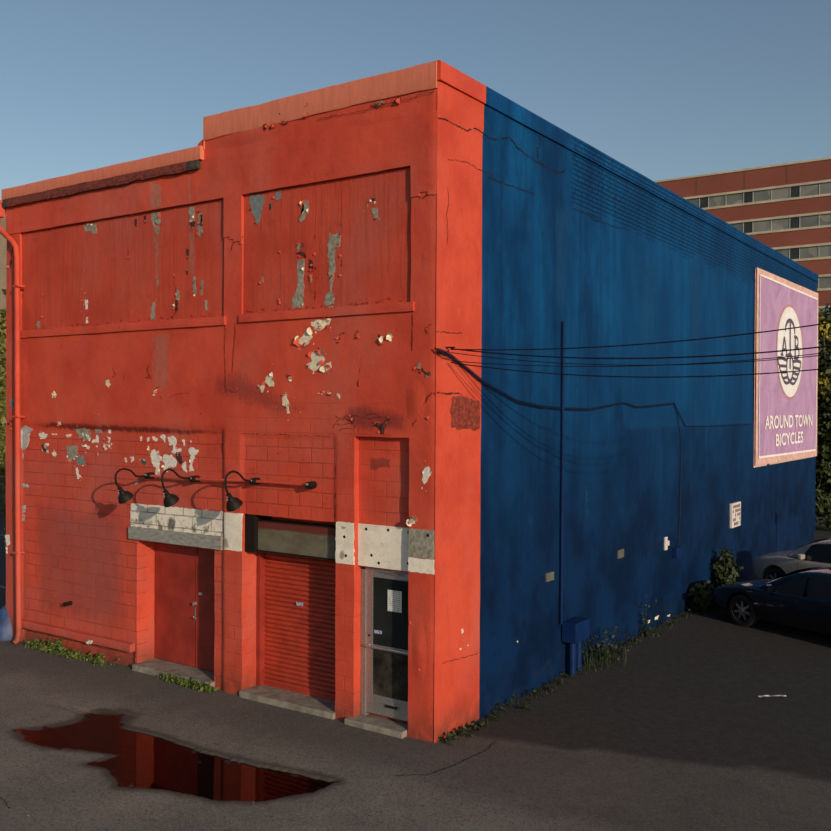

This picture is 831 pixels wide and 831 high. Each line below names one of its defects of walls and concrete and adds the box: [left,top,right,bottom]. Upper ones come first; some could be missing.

crack [437,117,621,203]
peeling [133,212,161,234]
peeling [189,207,204,238]
peeling [249,189,281,225]
peeling [298,200,309,222]
peeling [186,248,209,311]
peeling [120,286,180,323]
peeling [276,224,390,374]
peeling [257,372,274,393]
peeling [276,392,301,421]
peeling [5,421,112,479]
peeling [123,434,199,475]